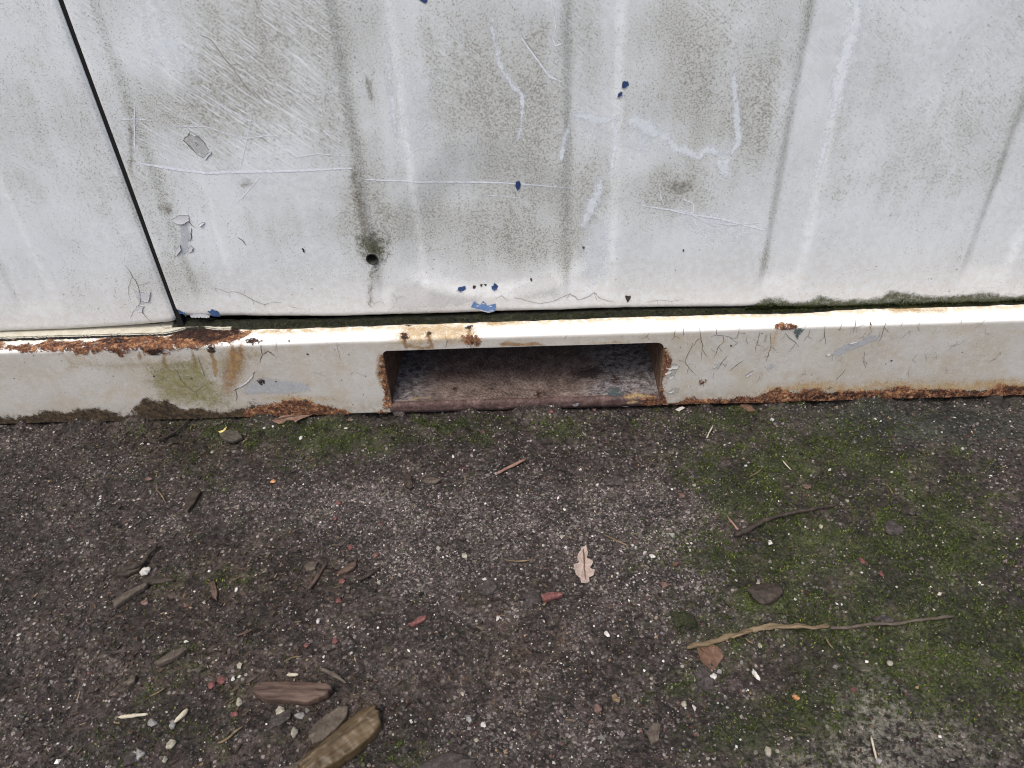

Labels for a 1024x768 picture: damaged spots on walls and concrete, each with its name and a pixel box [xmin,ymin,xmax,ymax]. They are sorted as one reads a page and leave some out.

peeling [171,215,205,258]
rust [0,328,263,393]
rust [244,397,362,417]
rust [377,357,392,414]
rust [400,325,482,350]
rust [572,366,619,384]
rust [773,322,798,338]
crack [642,319,1001,383]
rust [627,351,1024,406]